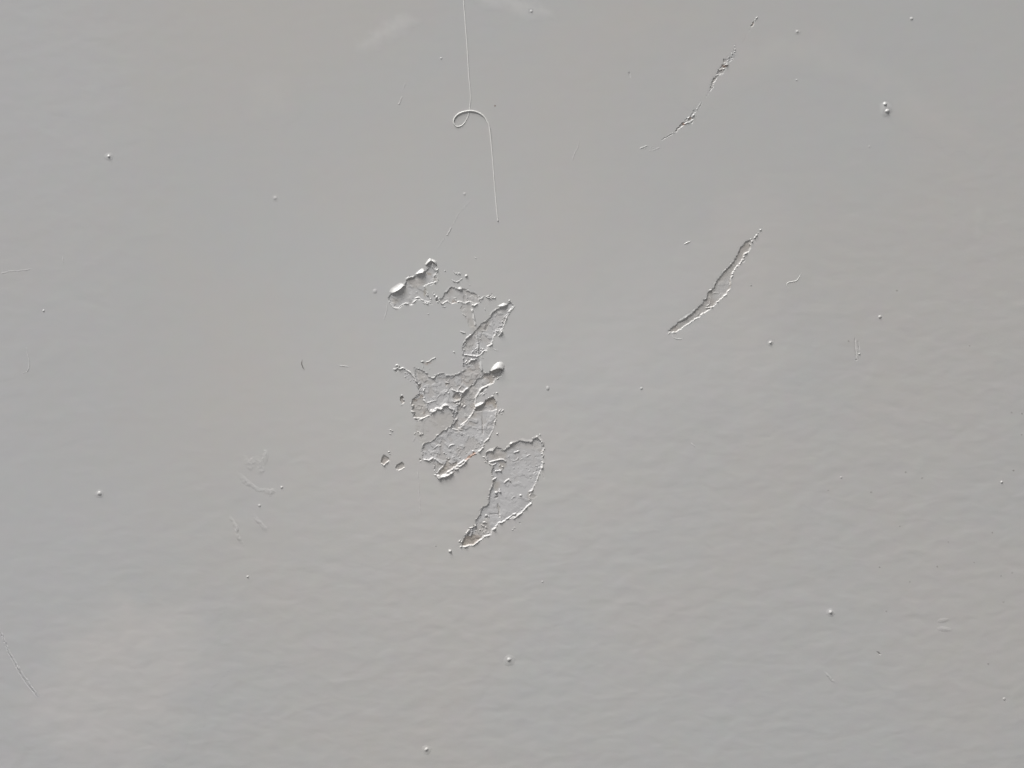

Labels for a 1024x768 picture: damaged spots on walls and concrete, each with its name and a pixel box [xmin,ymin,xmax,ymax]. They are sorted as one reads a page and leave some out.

spalling [668,229,762,333]
peeling [387,258,546,548]
peeling [380,451,405,472]